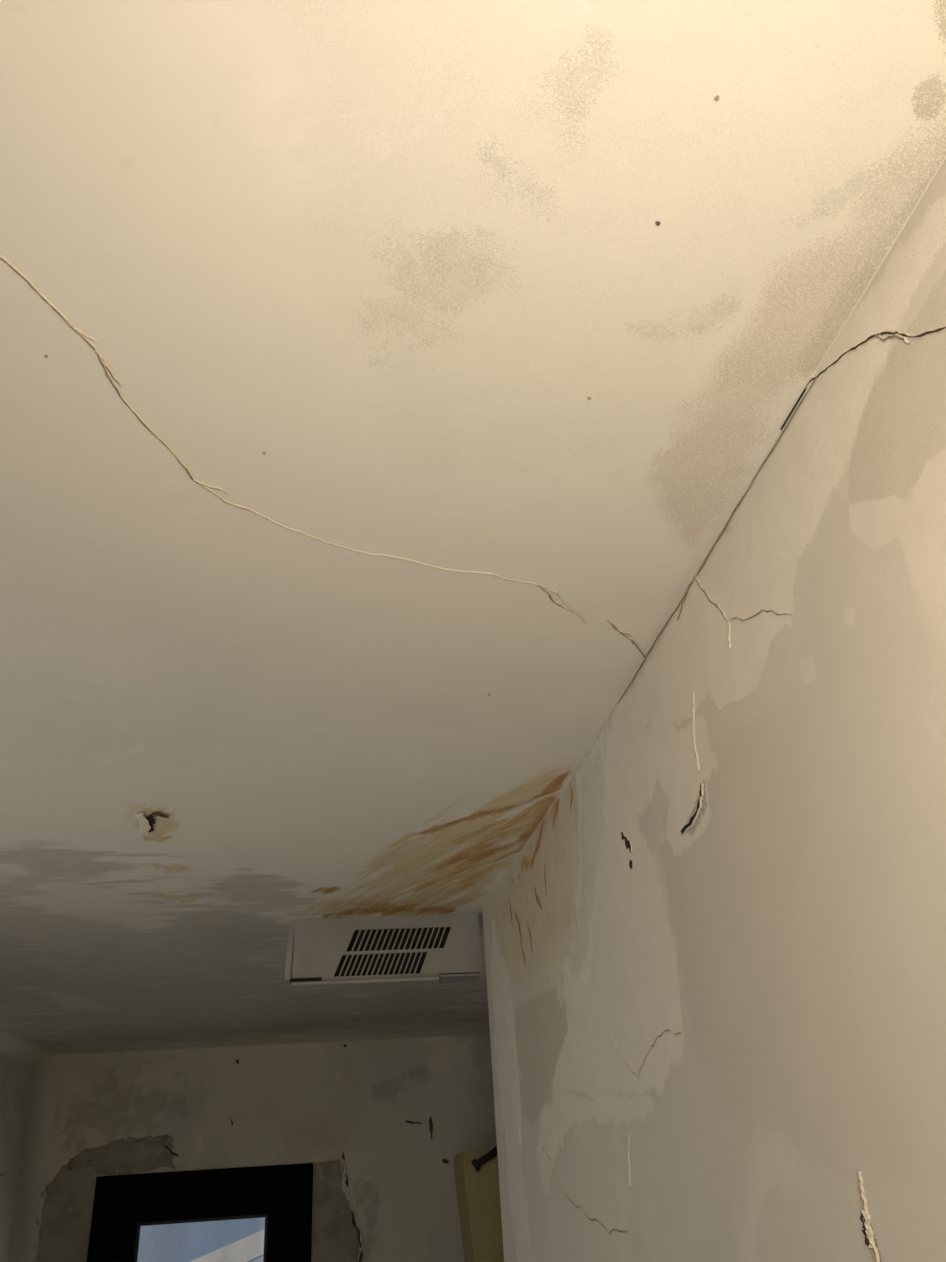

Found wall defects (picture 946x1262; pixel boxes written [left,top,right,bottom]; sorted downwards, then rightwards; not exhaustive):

crack [0,255,946,703]
flaking render [121,803,183,844]
spalling [621,831,633,869]
spalling [681,780,707,839]
flaking render [33,1135,179,1262]
spalling [857,1170,884,1262]